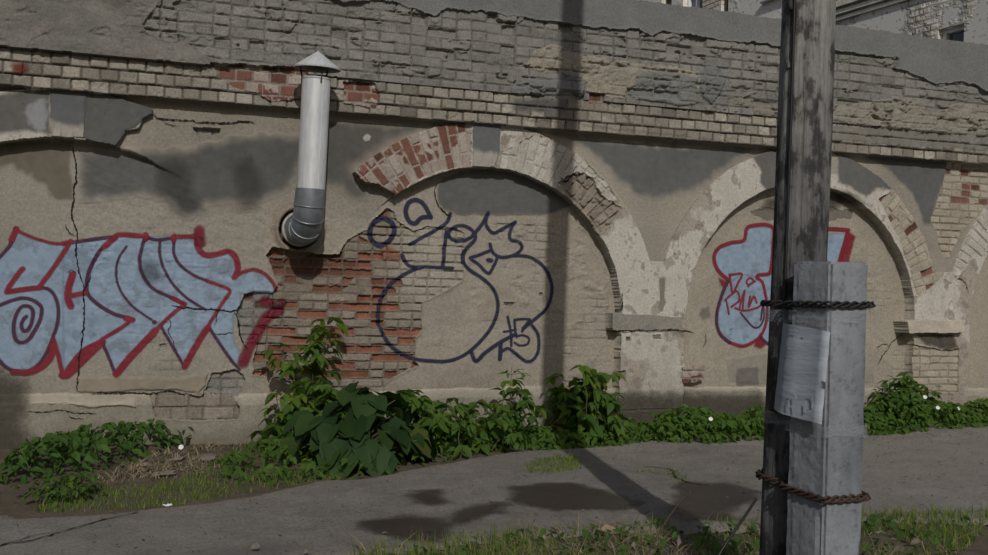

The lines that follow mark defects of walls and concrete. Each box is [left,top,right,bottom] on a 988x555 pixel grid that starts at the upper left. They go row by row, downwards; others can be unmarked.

crack [28,147,206,419]
crack [153,114,255,126]
spalling [28,208,464,420]
spalling [355,120,475,195]
spalling [143,0,780,117]
spalling [500,134,622,234]
spalling [833,50,988,131]
spalling [879,161,988,295]